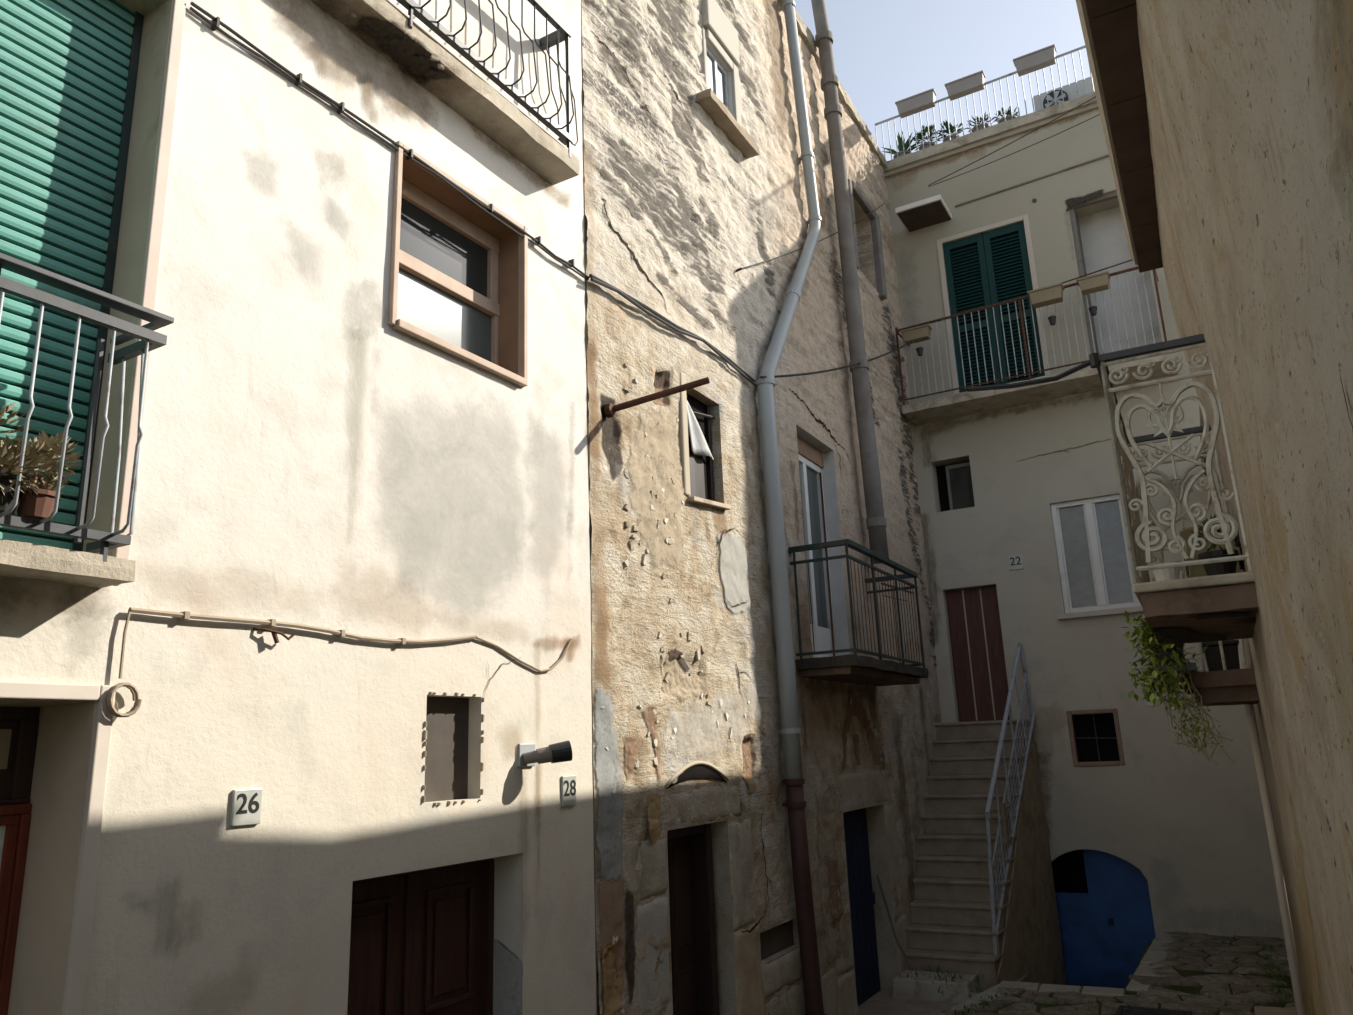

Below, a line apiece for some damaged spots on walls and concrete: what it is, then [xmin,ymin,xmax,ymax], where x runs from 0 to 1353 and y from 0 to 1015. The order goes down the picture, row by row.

crack [601,192,667,311]